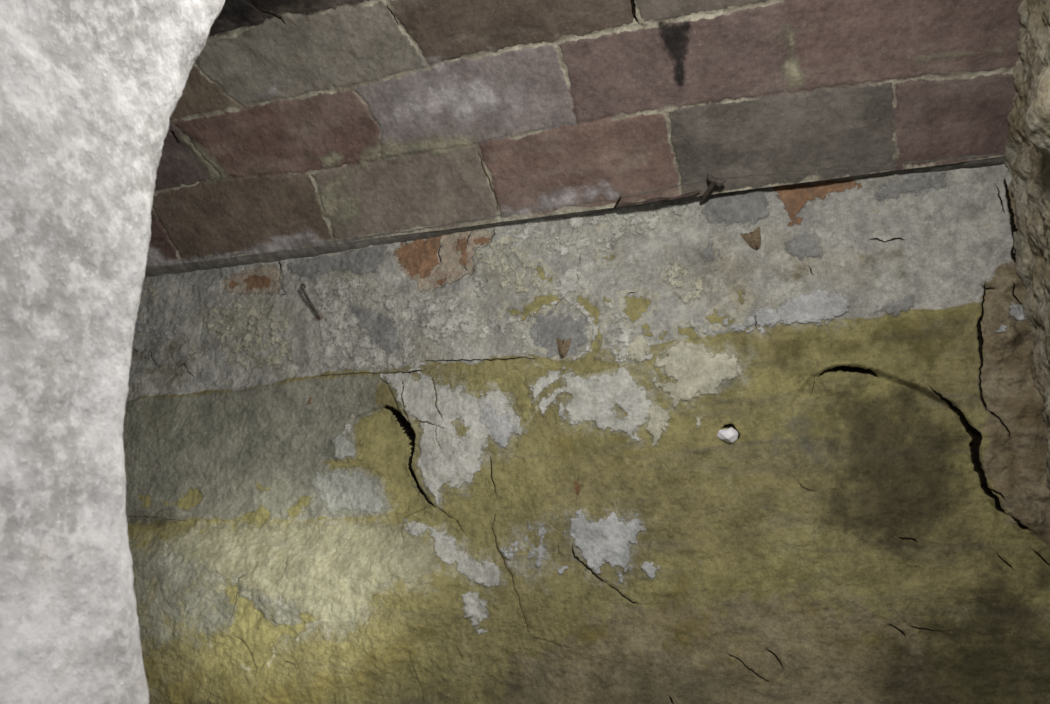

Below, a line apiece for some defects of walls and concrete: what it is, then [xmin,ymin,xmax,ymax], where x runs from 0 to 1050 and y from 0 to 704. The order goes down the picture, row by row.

crack [322,356,535,533]
flaking render [168,200,851,678]
crack [810,366,878,397]
crack [929,177,1050,565]
crack [490,457,571,648]
crack [558,544,638,604]